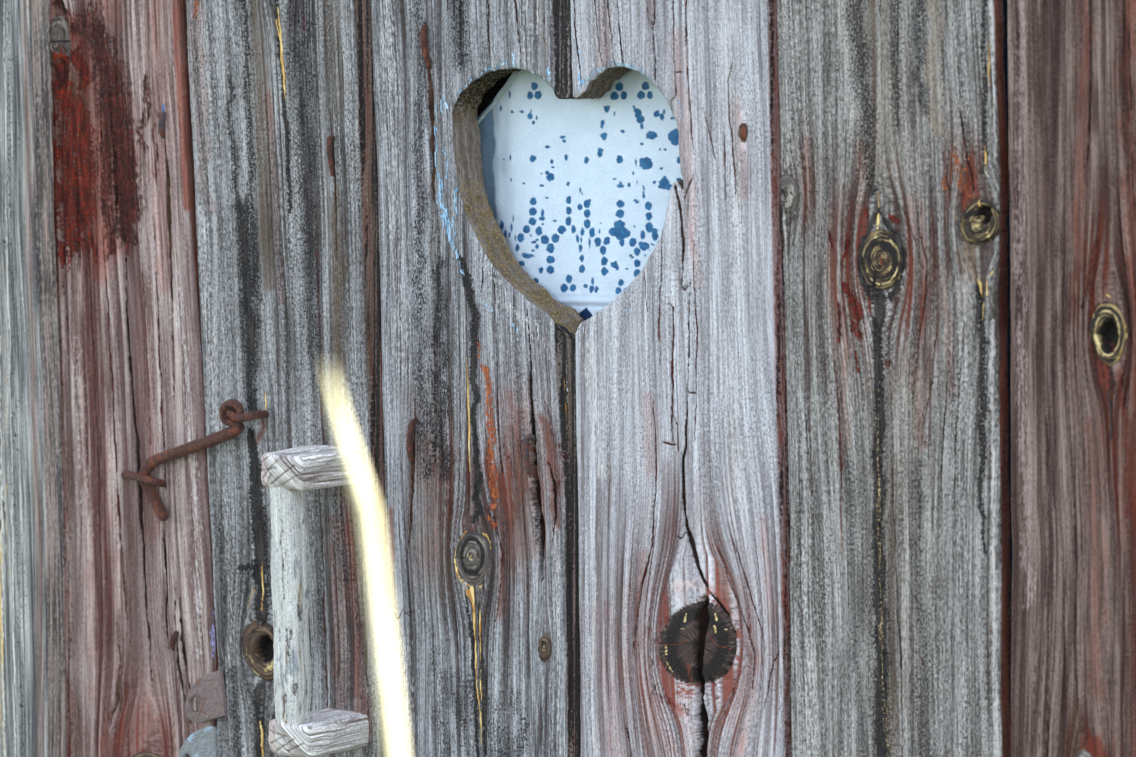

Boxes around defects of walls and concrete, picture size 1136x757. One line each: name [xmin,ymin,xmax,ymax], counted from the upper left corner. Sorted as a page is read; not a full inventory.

crack [487,0,545,68]
crack [573,0,624,88]
crack [480,253,557,582]
crack [632,0,788,757]
crack [491,516,504,682]